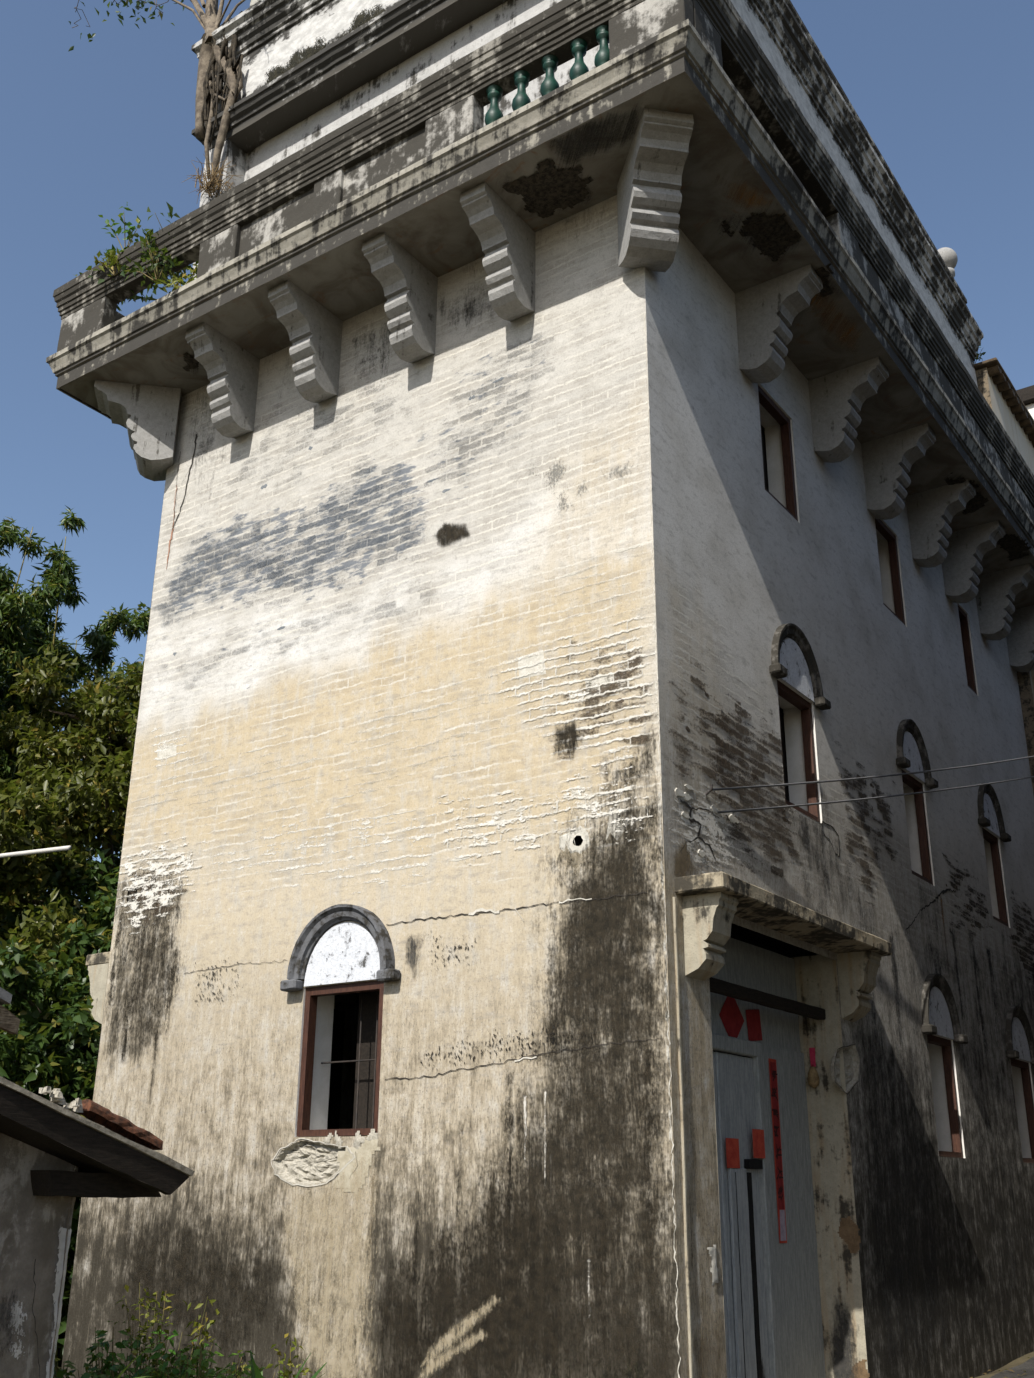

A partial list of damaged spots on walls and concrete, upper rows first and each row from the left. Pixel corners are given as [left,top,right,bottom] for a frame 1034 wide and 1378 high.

crack [172,434,197,530]
leakage [109,862,181,1095]
flaking render [116,313,800,1378]
leakage [287,740,680,1378]
crack [386,892,647,925]
leakage [856,920,1034,1378]
flaking render [8,1300,27,1360]
leakage [831,1304,857,1378]